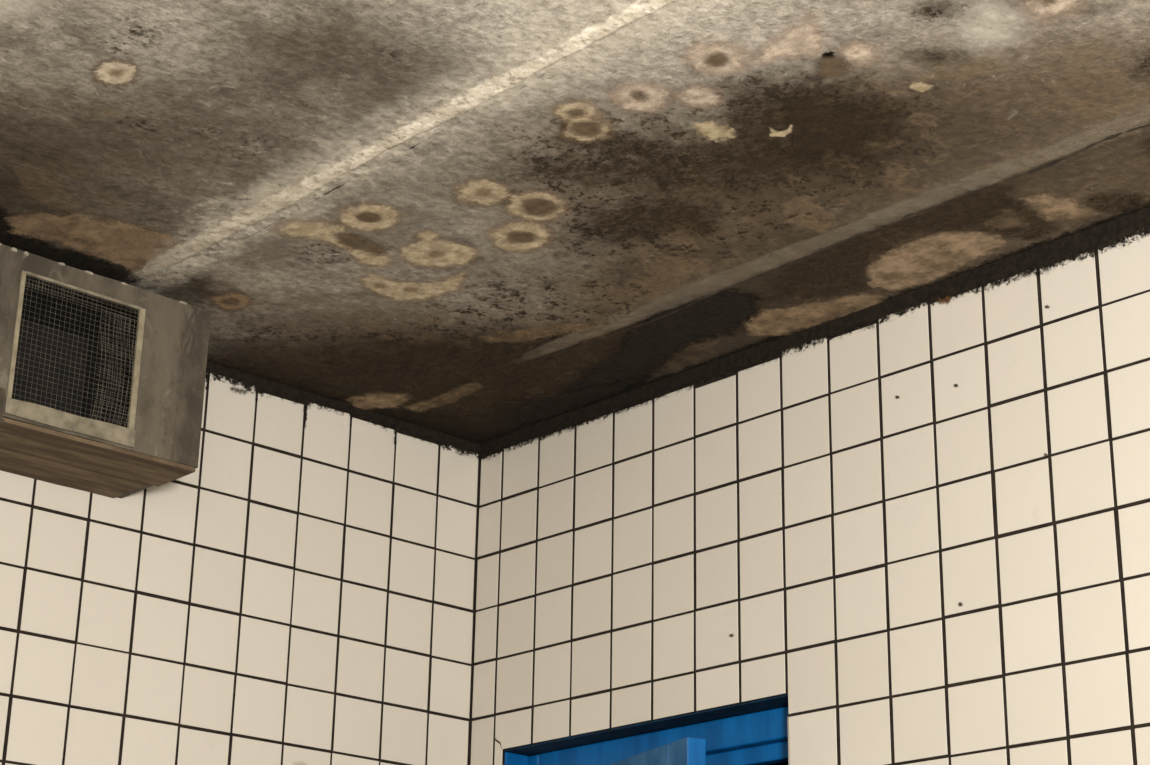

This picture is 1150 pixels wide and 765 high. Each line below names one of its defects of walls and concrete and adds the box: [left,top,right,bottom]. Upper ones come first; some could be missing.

damp [456,22,933,260]
damp [0,118,1150,460]
flaking render [745,230,1006,336]